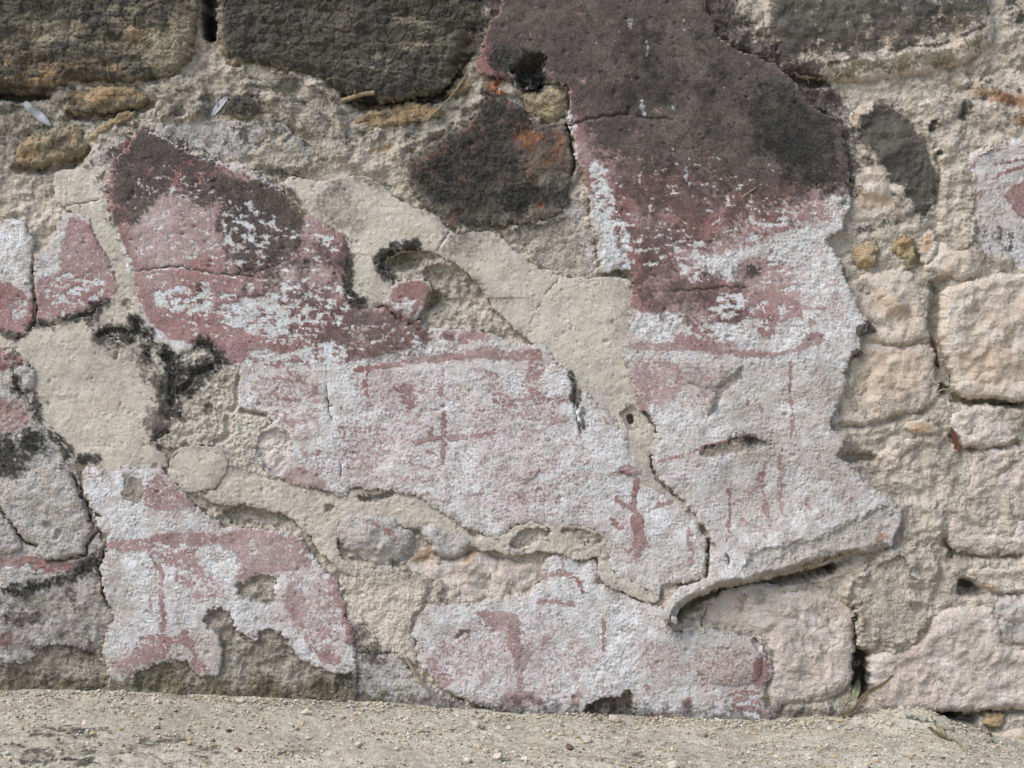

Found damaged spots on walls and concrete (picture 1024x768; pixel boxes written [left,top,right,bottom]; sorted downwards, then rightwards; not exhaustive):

water stain [458,0,872,203]
water stain [354,92,568,228]
peeling [588,160,633,271]
crack [132,256,293,277]
spalling [382,248,488,318]
spalling [619,404,642,431]
spalling [256,428,293,475]
crack [1,476,112,609]
spalling [224,505,290,527]
spalling [359,490,394,502]
spalling [511,528,604,549]
spalling [222,568,277,605]